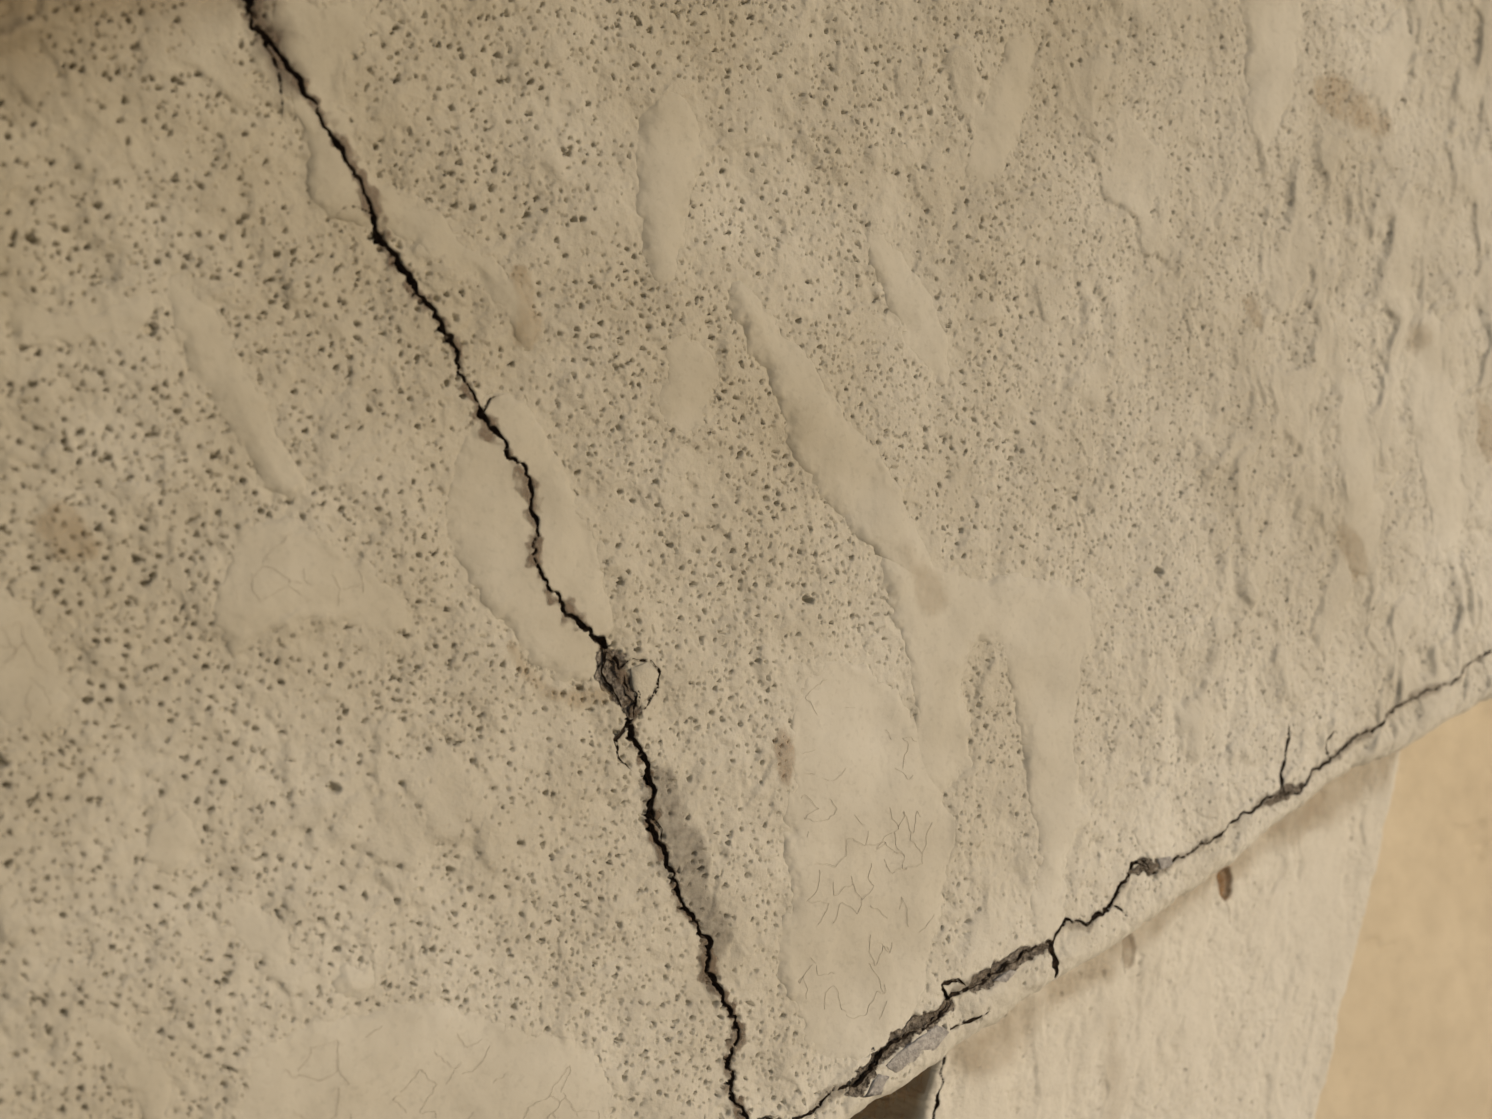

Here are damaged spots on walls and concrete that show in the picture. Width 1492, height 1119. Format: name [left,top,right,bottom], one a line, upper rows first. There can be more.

crack [237,0,749,1119]
crack [765,650,1492,1119]